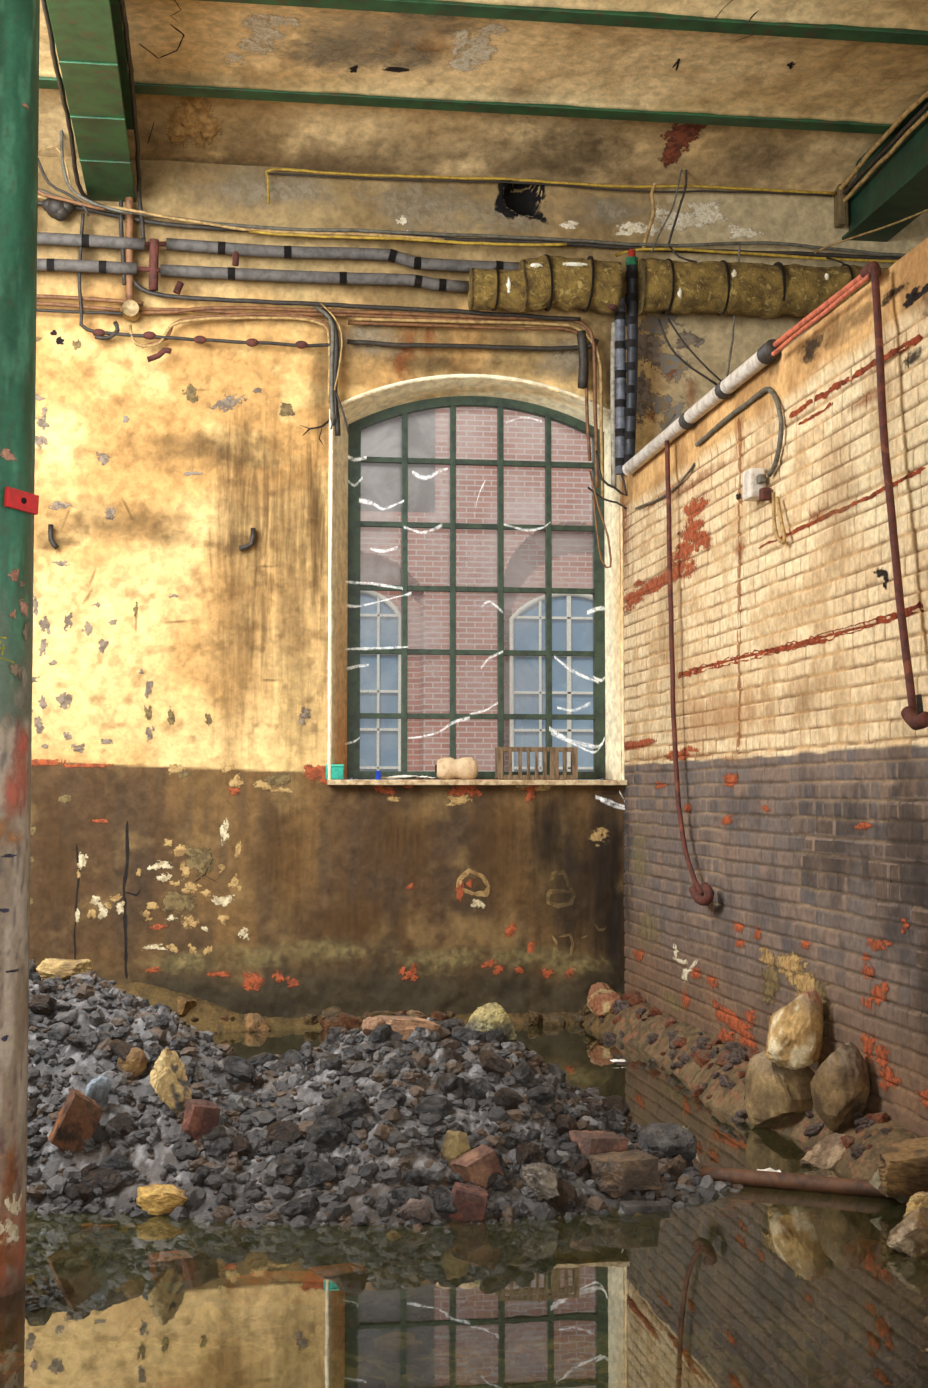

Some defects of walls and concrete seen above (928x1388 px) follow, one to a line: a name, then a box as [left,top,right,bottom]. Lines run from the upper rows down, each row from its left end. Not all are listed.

damp [303,13,462,67]
spalling [494,180,579,229]
peeling [616,199,764,239]
crack [903,283,928,308]
hole [36,330,81,350]
peeling [182,383,262,413]
peeling [623,492,713,613]
corrosion [677,418,925,755]
peeling [138,669,175,742]
peeling [75,817,249,956]
damp [672,943,701,983]
corrosion [0,1224,12,1261]